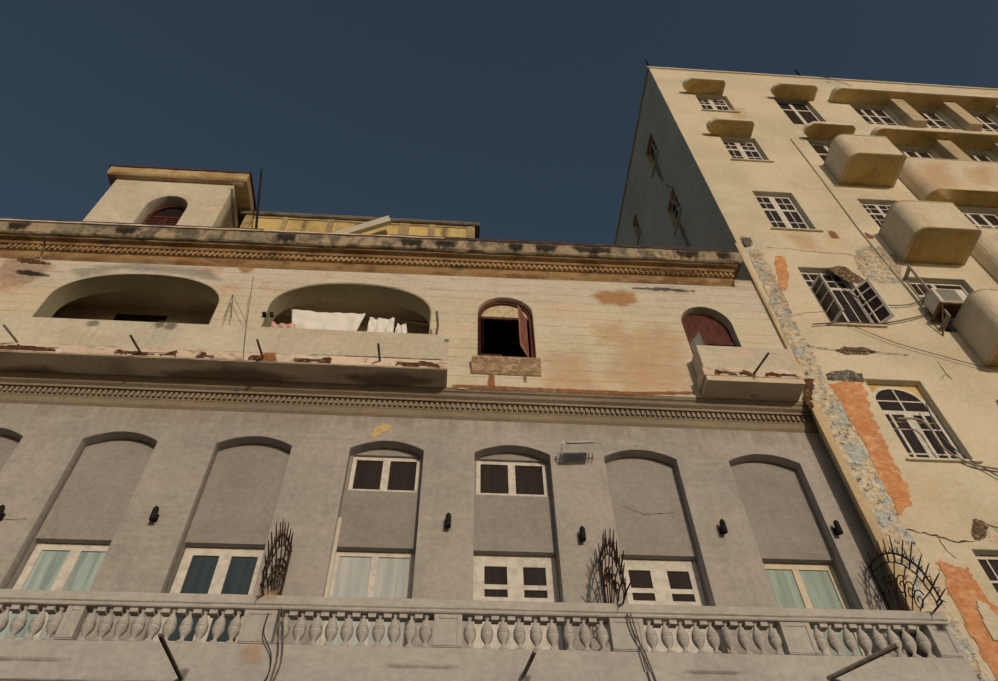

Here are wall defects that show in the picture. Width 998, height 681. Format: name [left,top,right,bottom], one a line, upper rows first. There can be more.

spalling [740,236,998,681]